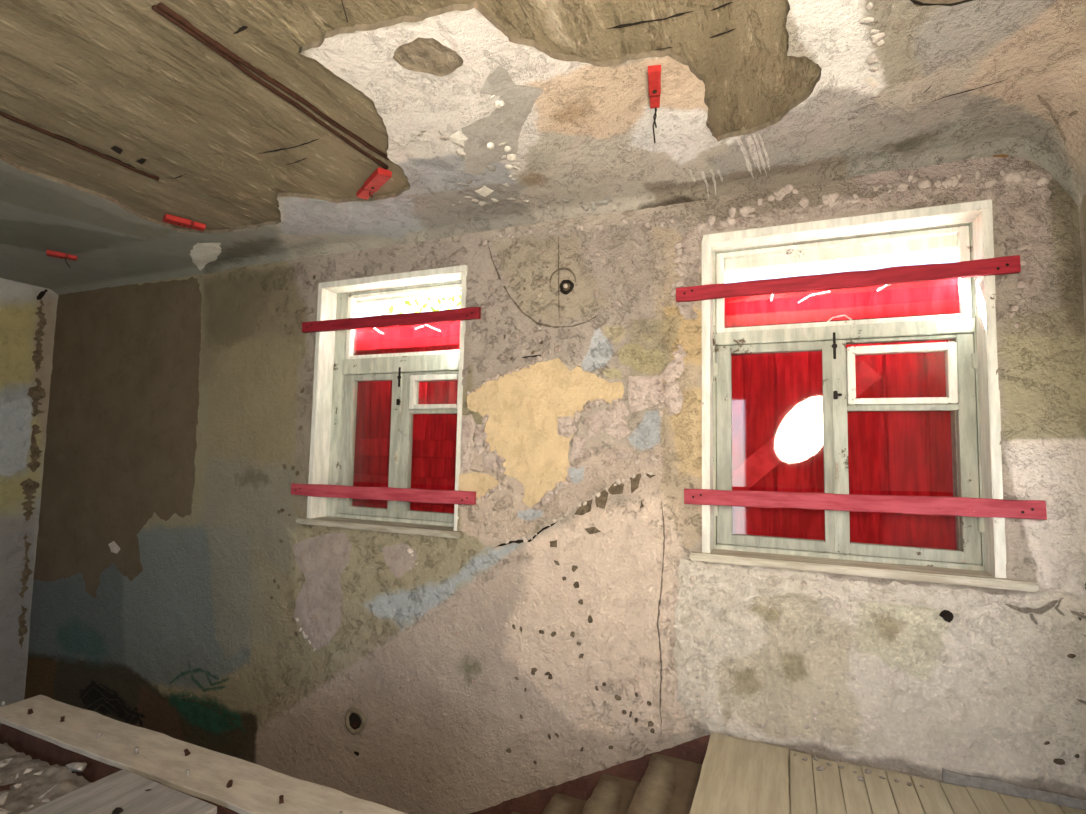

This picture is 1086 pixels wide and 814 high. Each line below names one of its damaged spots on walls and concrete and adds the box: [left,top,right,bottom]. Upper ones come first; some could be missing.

spalling [0,0,822,651]
crack [657,500,665,723]